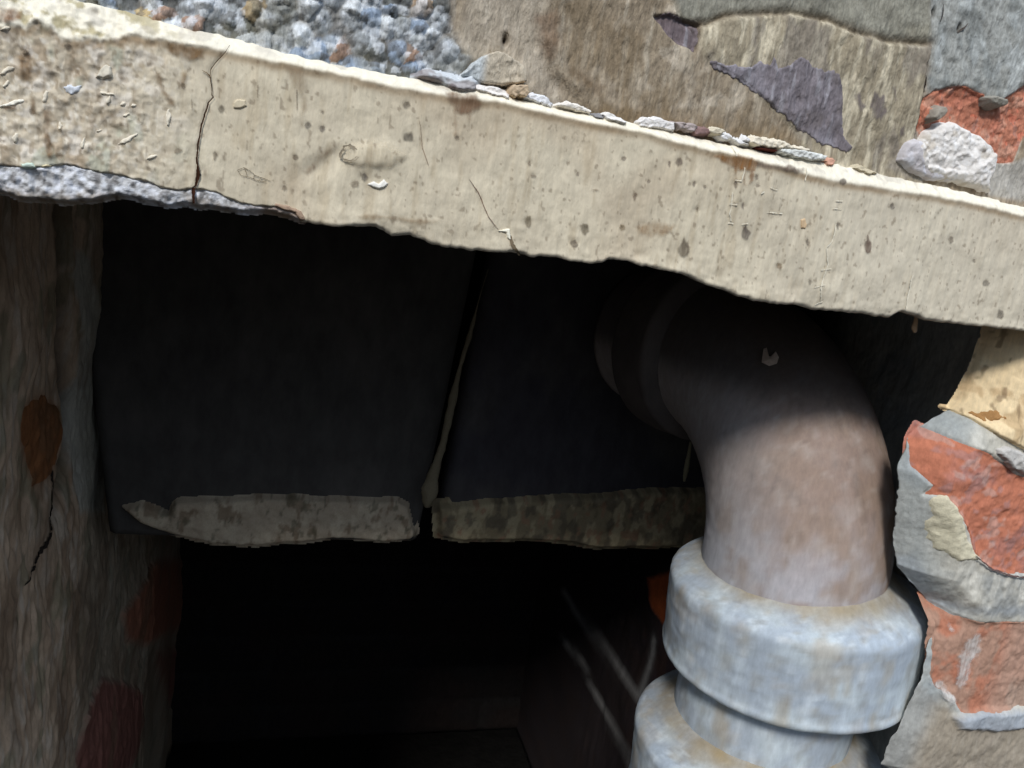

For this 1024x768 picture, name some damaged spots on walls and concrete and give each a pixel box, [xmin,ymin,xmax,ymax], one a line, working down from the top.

spalling [0,163,306,225]
crack [191,45,230,204]
crack [469,179,520,255]
spalling [476,84,836,180]
peeling [728,167,758,238]
spalling [849,164,877,175]
flaking render [917,86,1024,163]
flaking render [902,310,1024,578]
crack [24,471,54,586]
flaking render [917,591,1024,714]